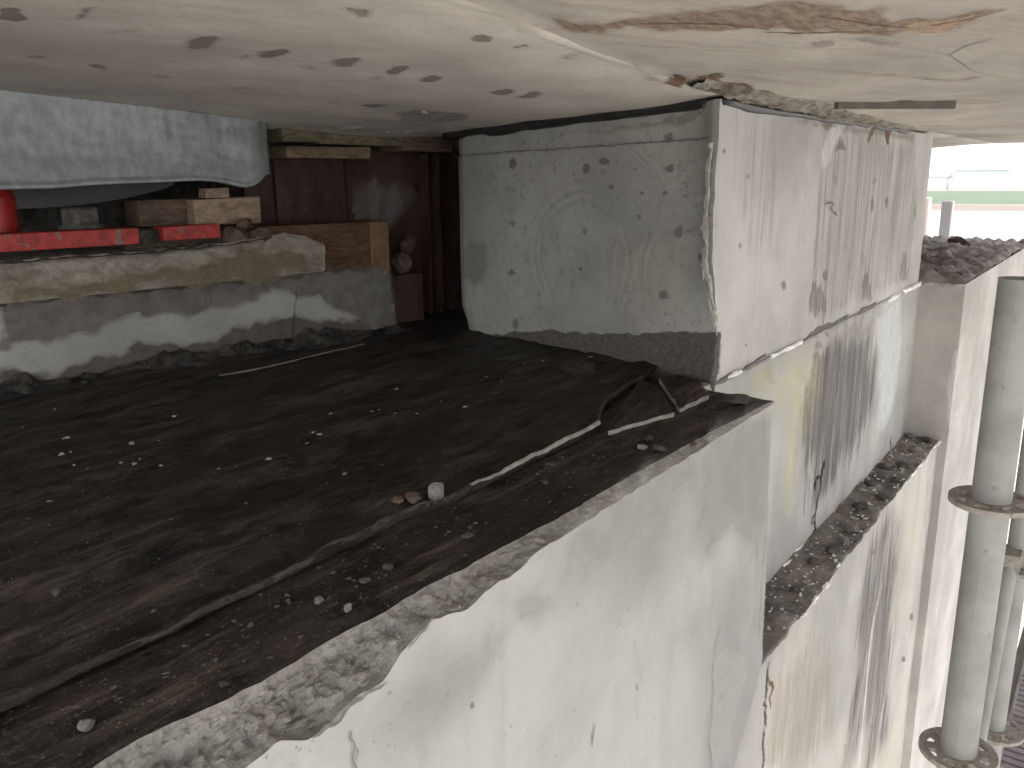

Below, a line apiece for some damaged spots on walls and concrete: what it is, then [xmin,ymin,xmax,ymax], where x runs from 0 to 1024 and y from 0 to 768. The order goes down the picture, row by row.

water stain [0,267,395,380]
spalling [494,143,721,391]
water stain [770,135,922,503]
crack [812,462,825,533]